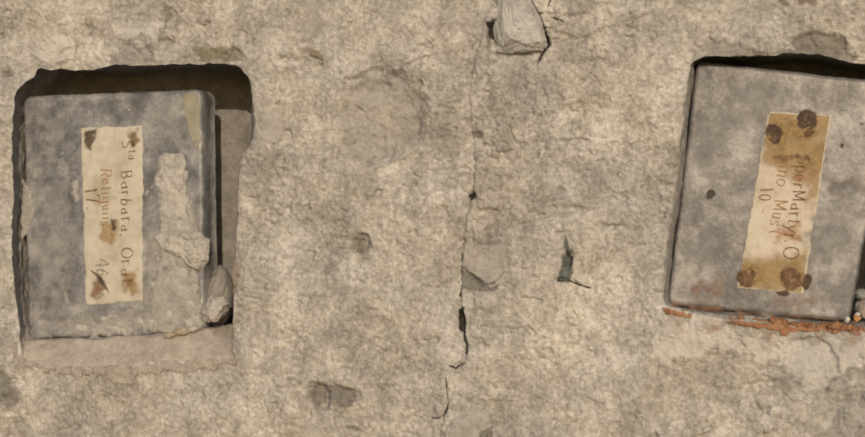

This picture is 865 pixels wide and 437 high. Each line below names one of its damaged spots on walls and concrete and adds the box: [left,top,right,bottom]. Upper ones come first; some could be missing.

rust [663,307,693,318]
rust [728,315,865,336]
crack [420,328,468,437]